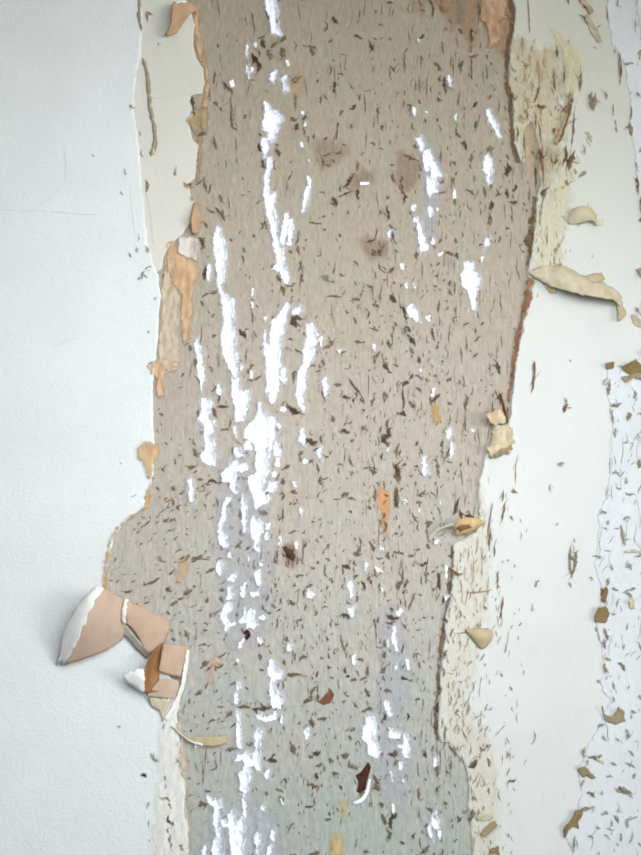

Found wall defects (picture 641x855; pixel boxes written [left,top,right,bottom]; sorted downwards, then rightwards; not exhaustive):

spalling [264,0,283,37]
spalling [260,101,295,285]
spalling [411,134,443,257]
spalling [460,235,492,311]
peeling [528,206,641,328]
peeling [603,359,641,383]
spalling [192,224,323,664]
leakage [438,530,495,810]
spalling [427,506,521,855]
spalling [199,657,284,855]
spalling [353,698,411,804]
leakage [207,805,279,855]